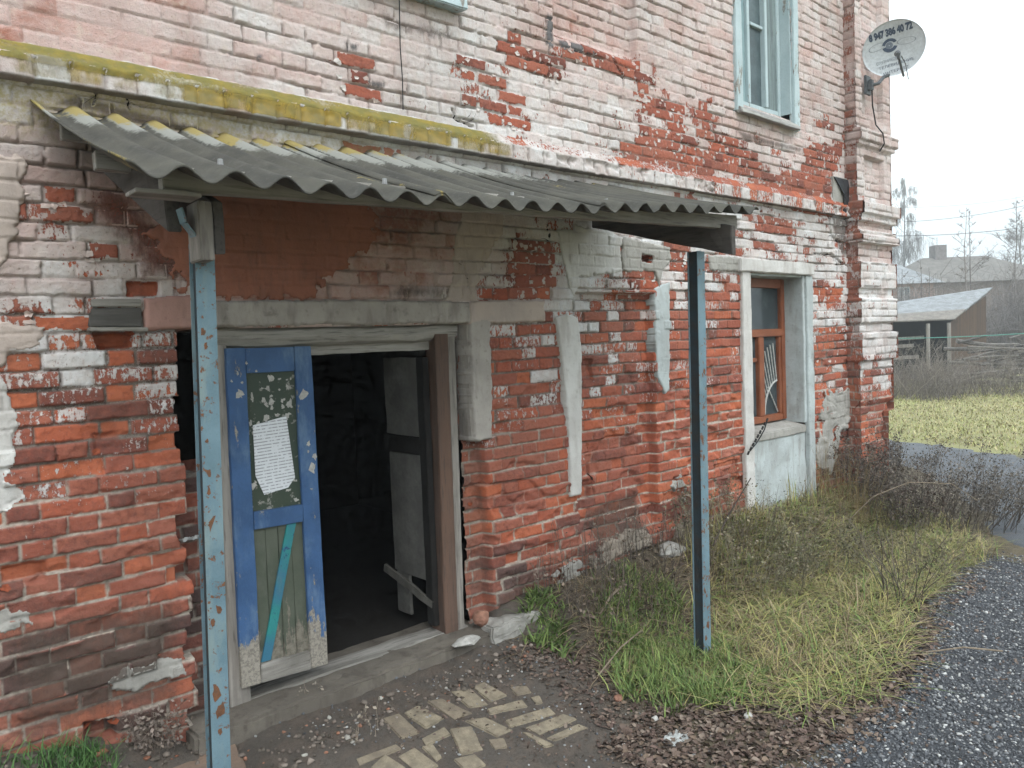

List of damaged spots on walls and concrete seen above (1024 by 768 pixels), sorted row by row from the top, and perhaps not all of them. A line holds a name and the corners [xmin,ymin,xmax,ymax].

leakage [70,99,187,130]
leakage [172,85,509,155]
peeling [455,28,846,200]
spalling [126,281,158,297]
peeling [492,239,558,299]
peeling [611,256,658,312]
peeling [664,242,691,271]
peeling [23,310,135,350]
spalling [581,360,594,381]
spalling [578,430,644,499]
spalling [462,478,545,515]
corrosion [213,684,225,735]